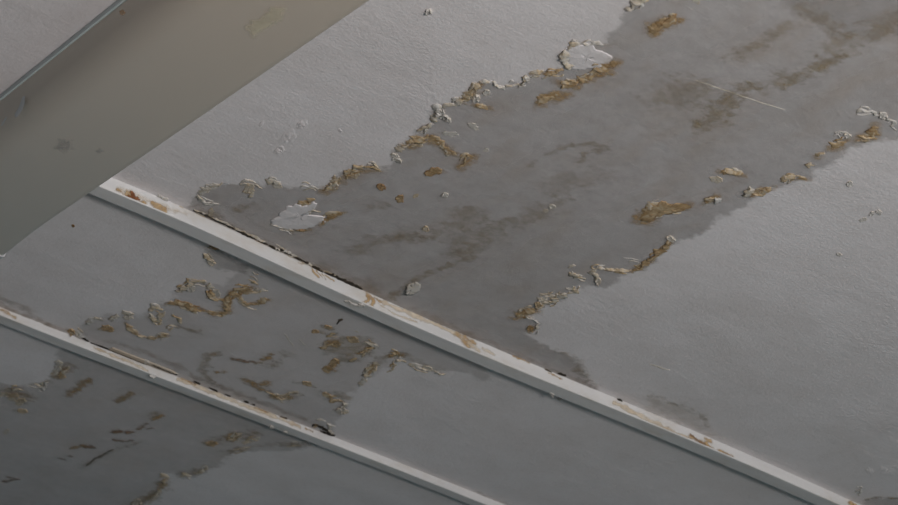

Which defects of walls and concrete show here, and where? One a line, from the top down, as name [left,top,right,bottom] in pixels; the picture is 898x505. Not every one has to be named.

peeling [647,13,684,37]
peeling [390,40,621,169]
peeling [270,161,381,235]
peeling [424,167,442,177]
peeling [632,199,691,225]
peeling [742,106,897,198]
peeling [66,271,269,340]
peeling [513,235,676,334]
peeling [312,325,446,387]
flaking render [312,418,335,436]